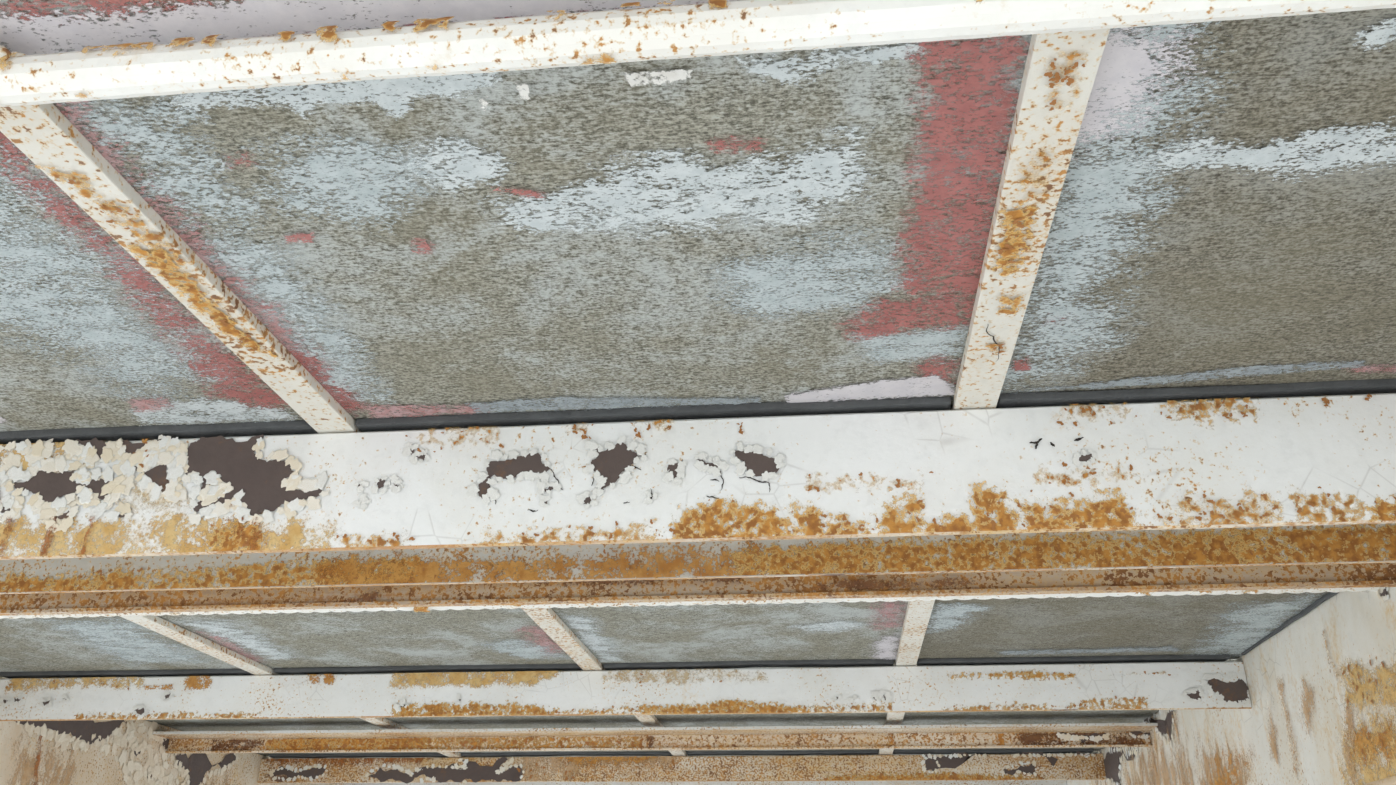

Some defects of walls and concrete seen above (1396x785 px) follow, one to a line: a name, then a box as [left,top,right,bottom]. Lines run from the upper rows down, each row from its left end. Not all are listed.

corrosion [35,165,277,357]
peeling [0,434,329,533]
peeling [467,435,648,510]
peeling [644,441,785,505]
corrosion [0,462,1396,612]
corrosion [5,676,212,692]
peeling [0,691,239,785]
corrosion [208,736,680,782]
peeling [365,757,524,784]
corrosion [390,671,895,716]
corrosion [820,770,1046,781]
peeling [1002,672,1251,785]